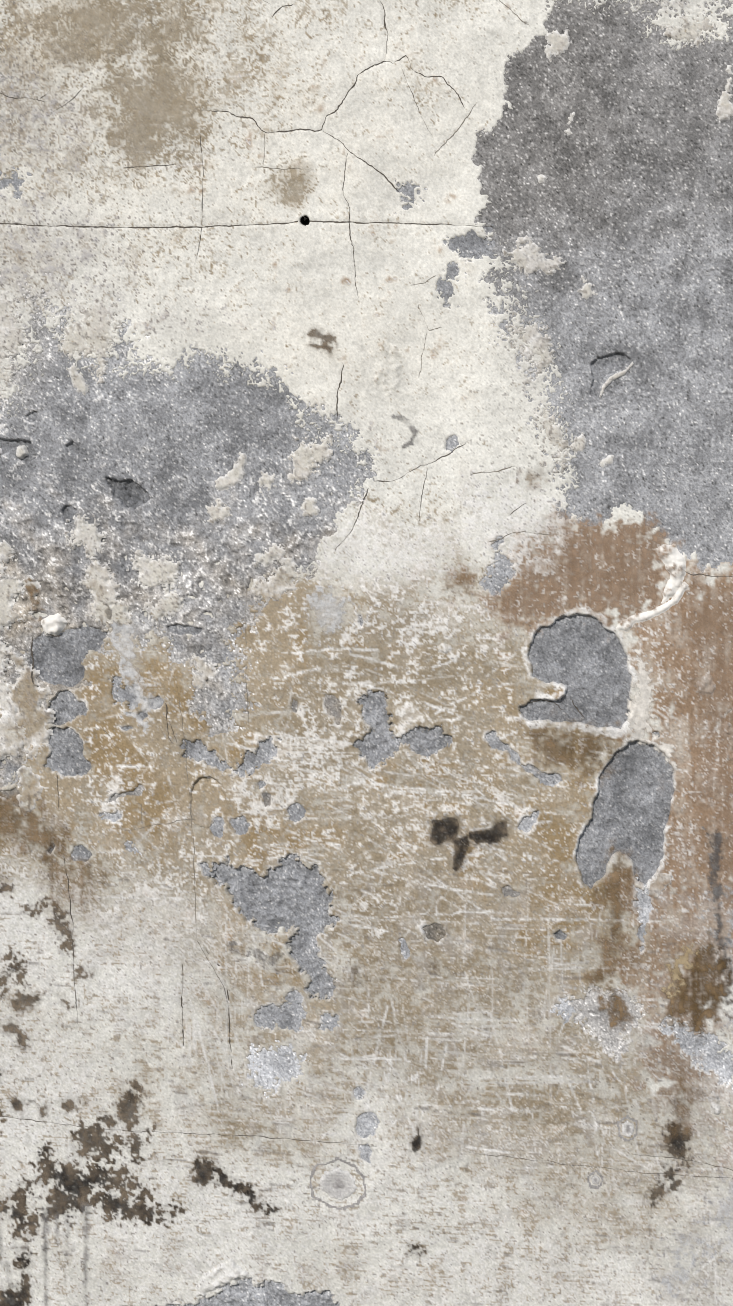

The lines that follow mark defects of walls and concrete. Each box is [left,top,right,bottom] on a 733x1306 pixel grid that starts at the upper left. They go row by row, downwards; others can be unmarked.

crack [0,3,478,295]
crack [336,365,344,415]
flaking render [435,0,733,573]
flaking render [0,273,381,838]
flaking render [520,614,632,729]
damp [623,649,677,772]
flaking render [200,854,340,1099]
damp [430,817,508,871]
flaking render [576,731,675,952]
damp [710,833,730,960]
damp [0,1080,185,1306]
damp [192,1158,279,1215]